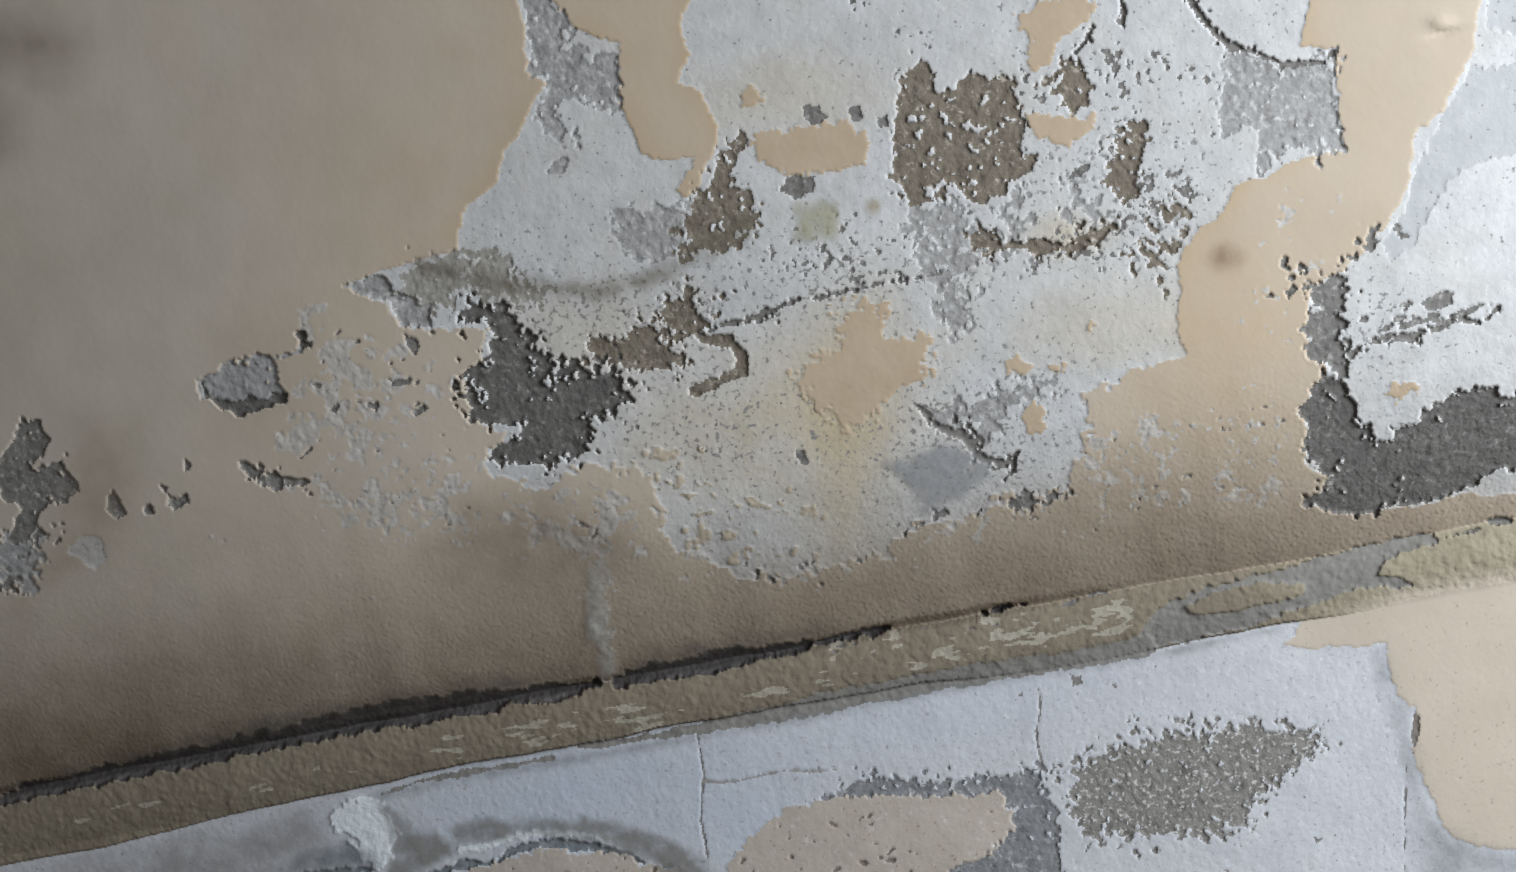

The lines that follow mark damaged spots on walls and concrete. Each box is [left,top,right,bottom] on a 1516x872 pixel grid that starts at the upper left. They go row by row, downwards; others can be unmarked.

crack [1068,0,1128,63]
crack [1184,0,1336,72]
peeling [197,0,1516,593]
spalling [0,417,107,596]
leakage [981,602,1028,617]
leakage [0,570,891,807]
peeling [0,533,1516,872]
leakage [577,635,1156,749]
leakage [249,754,702,872]